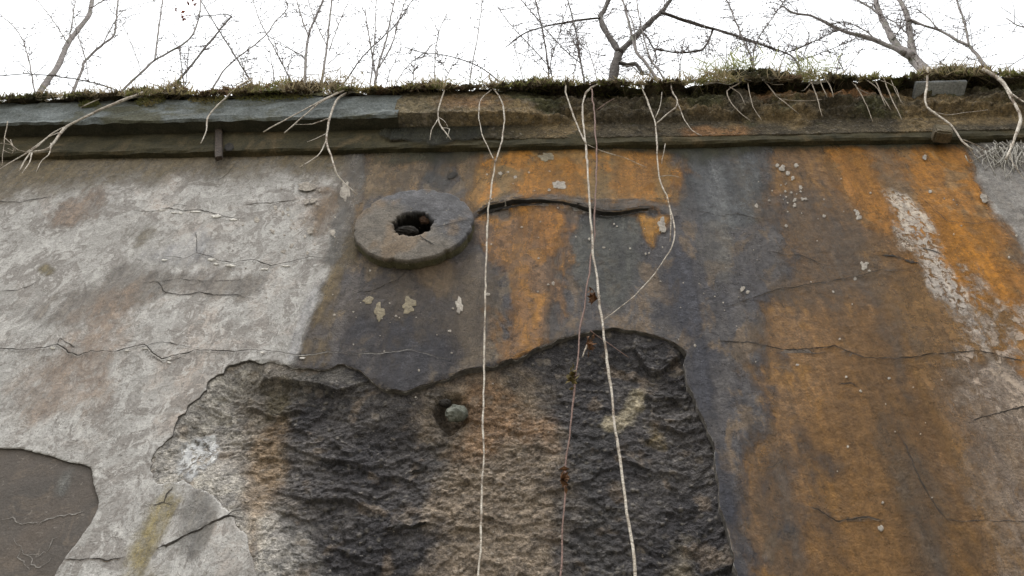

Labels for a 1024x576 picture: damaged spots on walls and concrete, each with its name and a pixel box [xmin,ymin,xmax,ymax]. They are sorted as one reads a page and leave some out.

crack [133,199,328,298]
corrosion [467,148,681,363]
crack [420,194,766,245]
leakage [867,141,1024,431]
crack [0,338,449,364]
leakage [0,146,876,576]
crack [703,341,1020,360]
corrosion [730,144,1024,576]
peeling [0,449,99,576]
crack [156,509,244,550]
spalling [151,331,734,576]